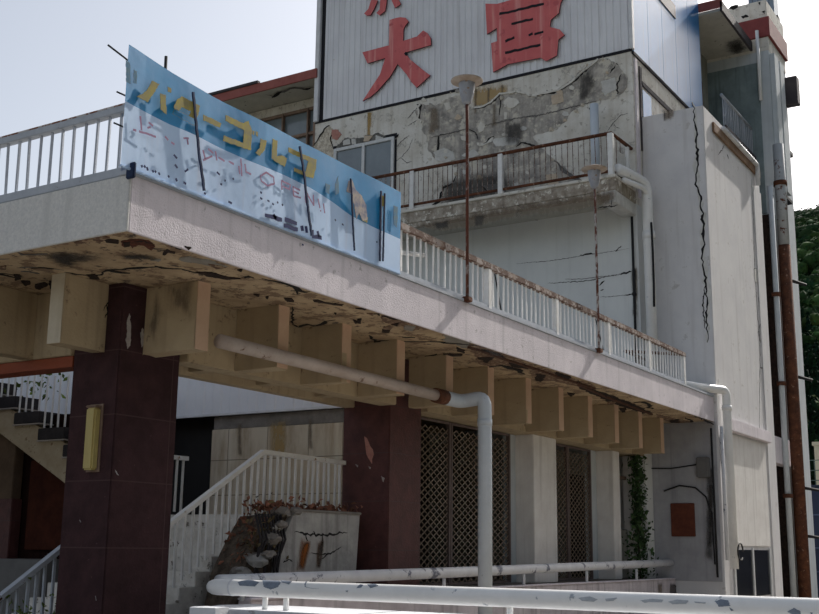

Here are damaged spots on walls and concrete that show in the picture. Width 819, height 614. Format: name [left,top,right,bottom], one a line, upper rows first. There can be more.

flaking render [313,125,399,158]
peeling [415,57,628,205]
crack [691,102,729,343]
peeling [179,256,228,269]
crack [518,246,624,264]
crack [553,271,632,297]
crack [0,252,443,357]
peeling [125,314,144,349]
corrosion [762,214,788,438]
crack [295,531,346,561]
corrosion [776,466,797,597]